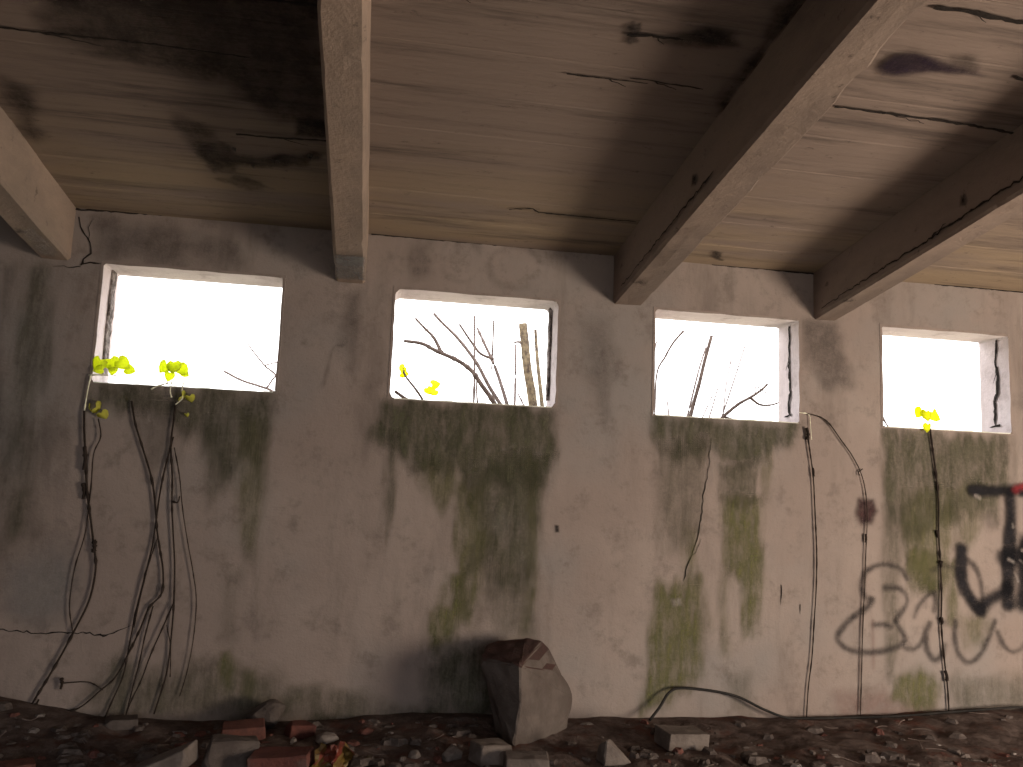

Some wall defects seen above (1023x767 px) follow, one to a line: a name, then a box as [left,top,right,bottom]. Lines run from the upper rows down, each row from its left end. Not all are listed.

leakage [48,0,326,137]
crack [621,171,713,286]
crack [821,176,1023,309]
leakage [429,460,542,621]
leakage [724,465,763,626]
leakage [642,577,701,713]